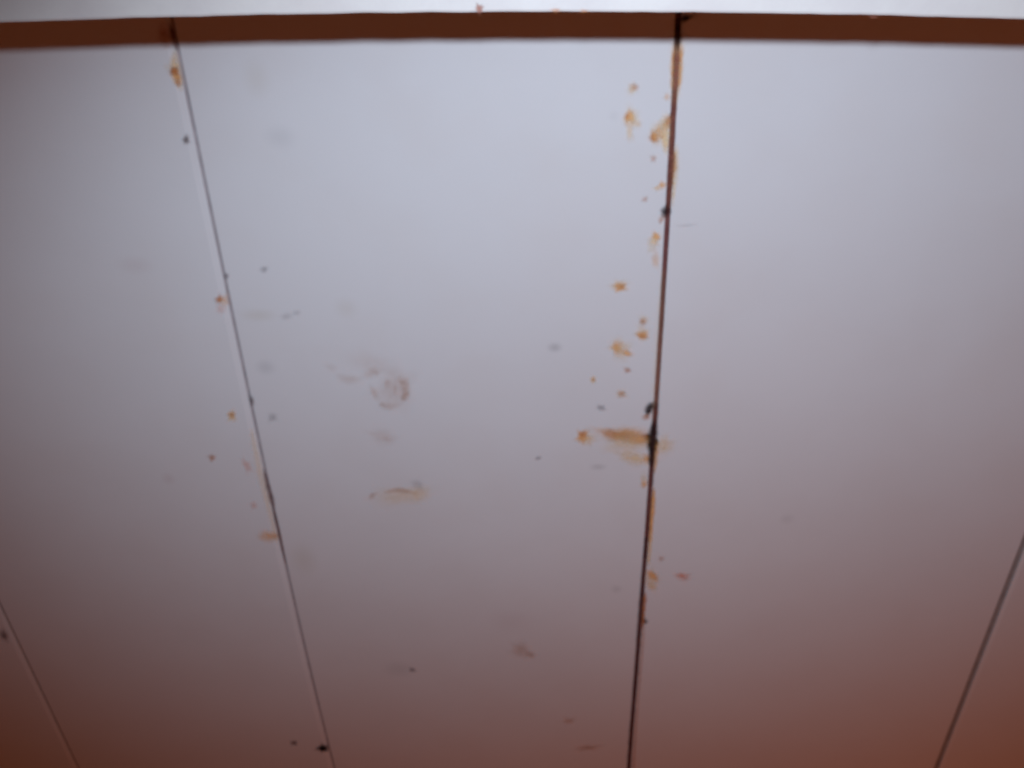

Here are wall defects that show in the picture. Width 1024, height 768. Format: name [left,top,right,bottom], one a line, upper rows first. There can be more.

rust [651,16,690,204]
rust [612,408,657,768]